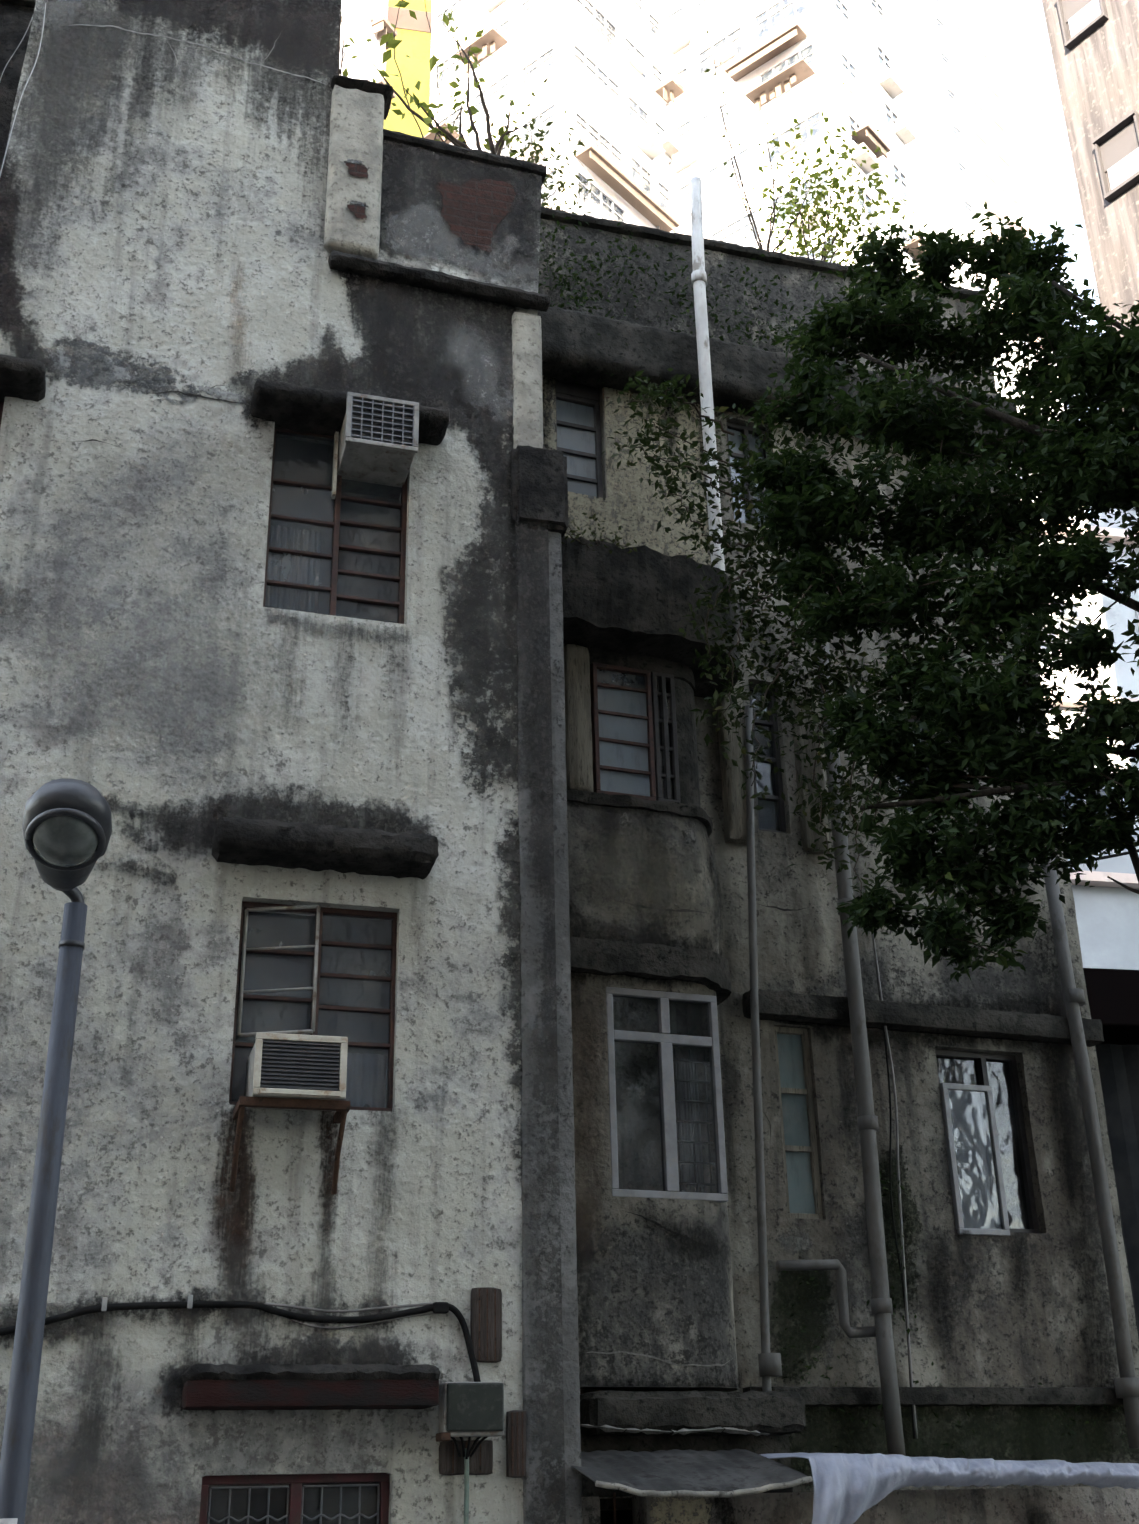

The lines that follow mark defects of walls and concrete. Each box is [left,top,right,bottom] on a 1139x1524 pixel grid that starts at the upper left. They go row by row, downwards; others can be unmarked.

leakage [0,0,341,385]
flaking render [344,159,369,178]
flaking render [347,201,368,219]
flaking render [435,178,517,268]
leakage [202,270,742,1524]
corrosion [212,1105,256,1288]
leakage [159,1297,199,1415]